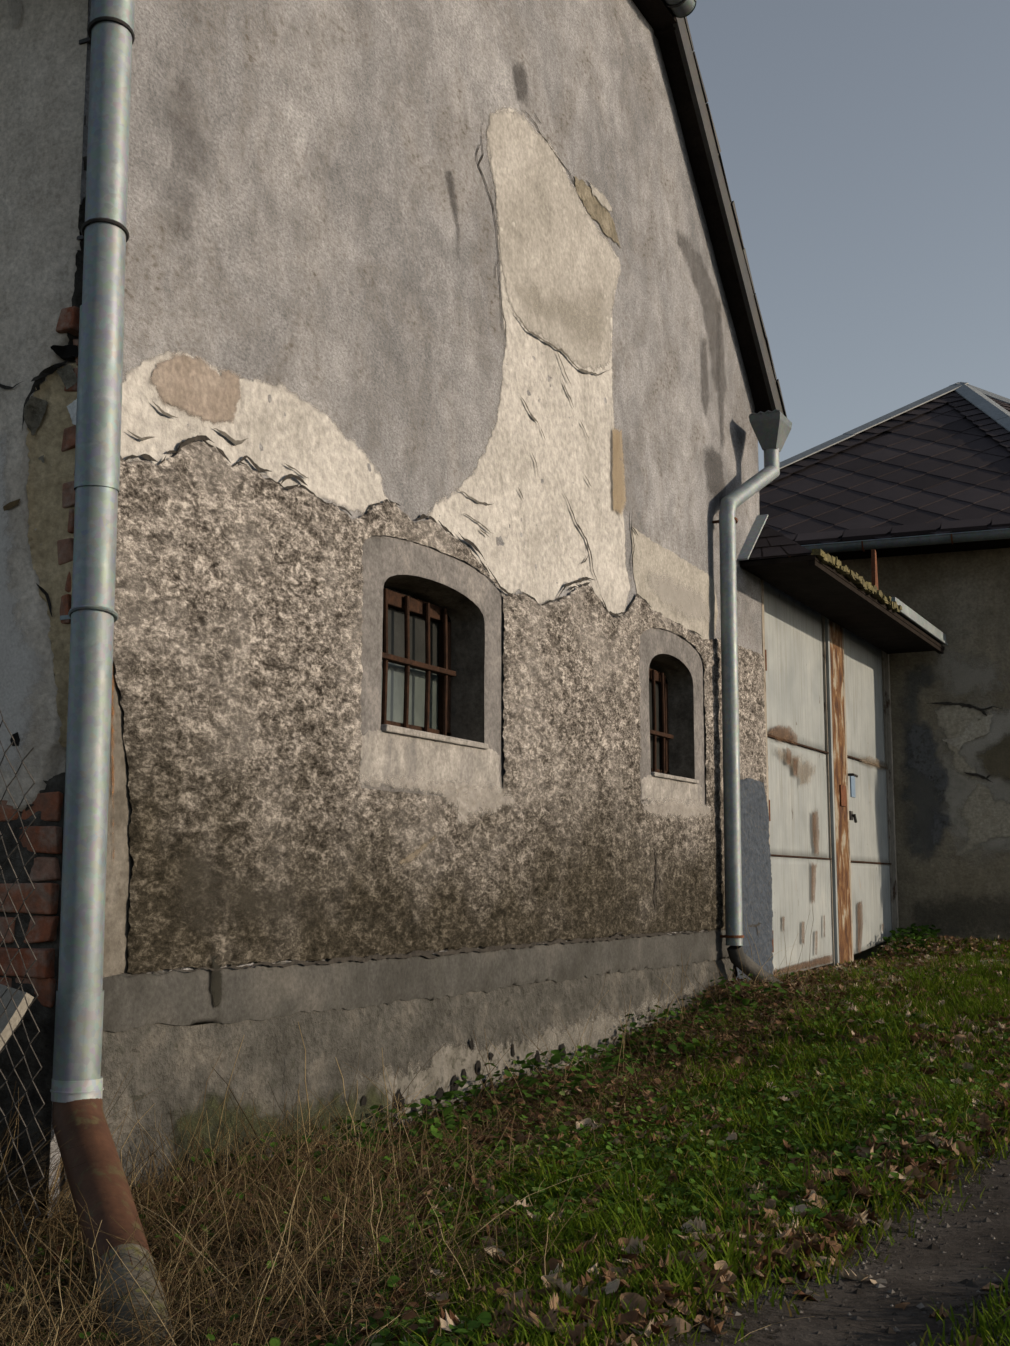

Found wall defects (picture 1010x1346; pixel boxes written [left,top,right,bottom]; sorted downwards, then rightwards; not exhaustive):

flaking render [3,197,86,747]
flaking render [120,351,401,516]
flaking render [417,107,718,640]
damp [901,653,1010,858]
crack [927,702,1001,716]
flaking render [934,702,1010,856]
crack [964,772,993,783]
flaking render [0,772,65,1247]